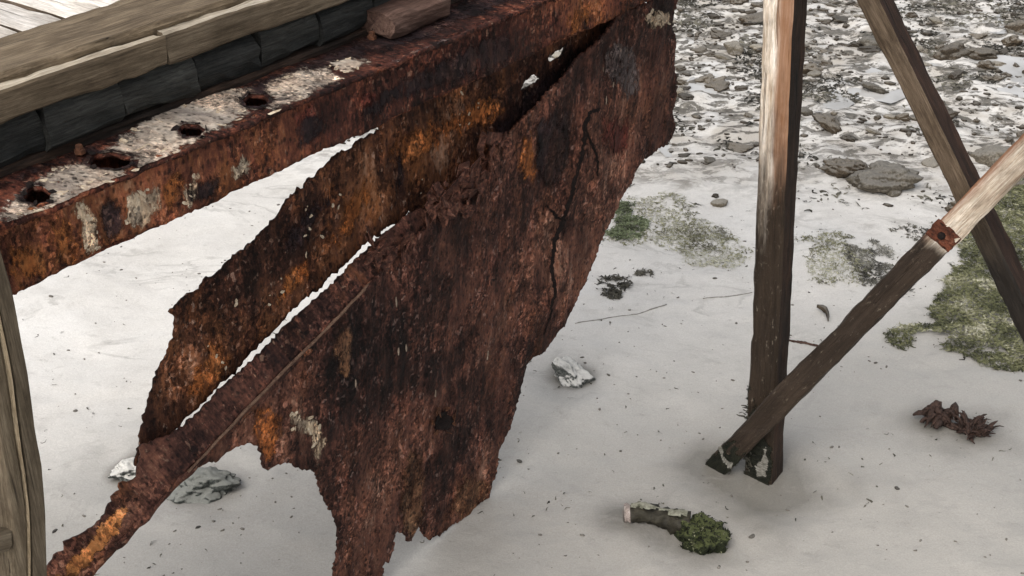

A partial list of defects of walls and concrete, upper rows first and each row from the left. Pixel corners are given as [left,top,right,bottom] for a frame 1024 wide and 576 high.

rust [229,0,519,98]
rust [389,43,590,231]
rust [11,219,78,279]
rust [95,197,123,241]
rust [163,172,220,211]
rust [285,192,334,252]
rust [330,175,415,272]
crack [543,108,616,335]
rust [188,341,231,396]
rust [334,328,352,378]
rust [251,407,282,461]
rust [56,507,128,576]